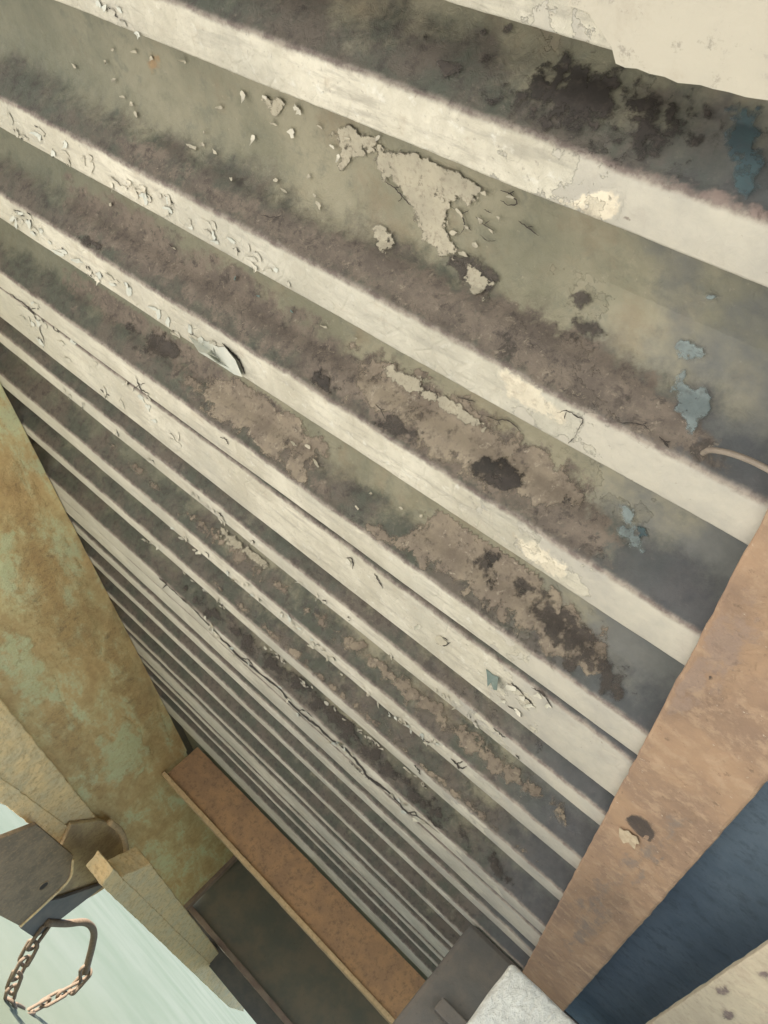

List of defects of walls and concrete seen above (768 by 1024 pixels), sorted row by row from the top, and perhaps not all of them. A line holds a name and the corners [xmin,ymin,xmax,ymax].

water stain [485,51,724,160]
peeling [317,124,500,301]
peeling [8,209,132,296]
peeling [148,306,245,377]
water stain [310,369,341,393]
water stain [471,456,524,491]
water stain [485,552,501,567]
crack [159,578,440,833]
peeling [486,669,552,717]